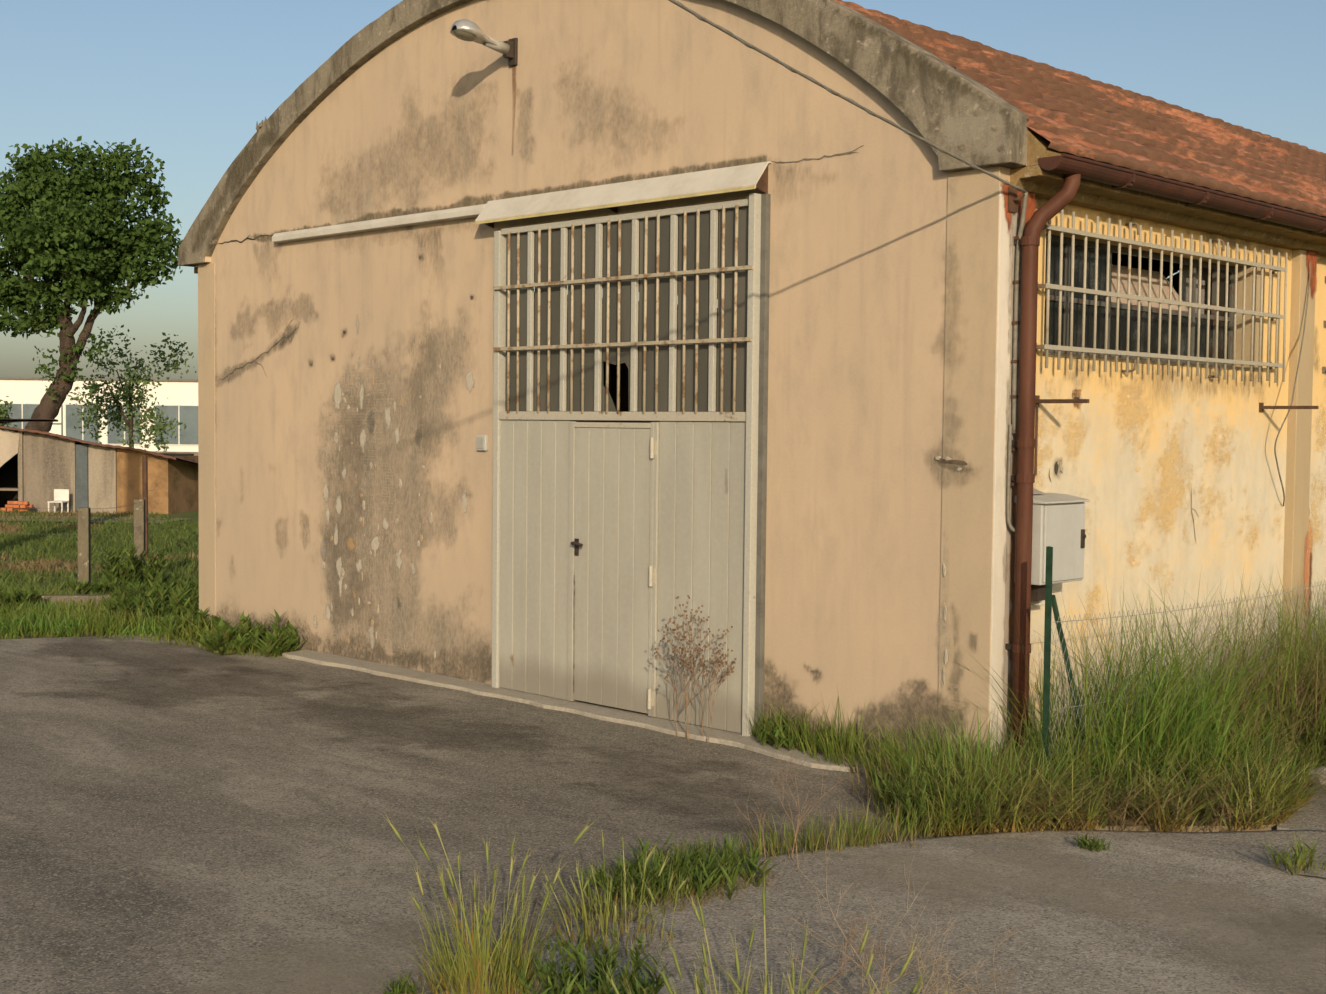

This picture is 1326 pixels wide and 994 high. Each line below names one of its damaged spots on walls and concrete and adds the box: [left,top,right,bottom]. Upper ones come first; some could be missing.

crack [771,145,864,164]
rust [1307,250,1318,298]
crack [218,319,299,381]
rust [1303,510,1313,656]
leakage [221,615,492,682]
leakage [764,666,823,742]
leakage [857,649,963,745]